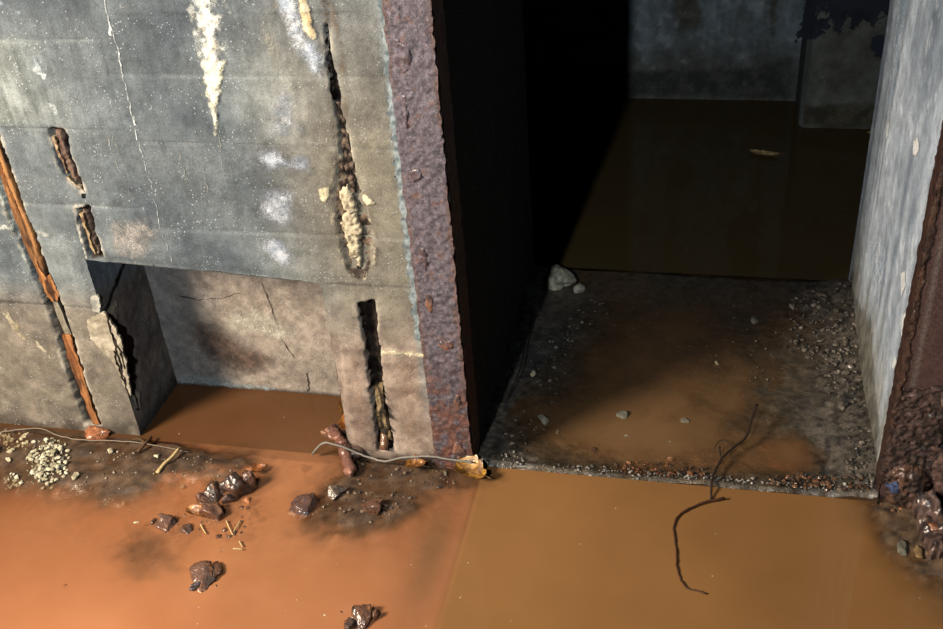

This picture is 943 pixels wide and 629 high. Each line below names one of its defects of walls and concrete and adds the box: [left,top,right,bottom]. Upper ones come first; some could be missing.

crack [104,0,172,261]
efflorescence [188,0,225,135]
crack [319,24,377,280]
rust [392,39,412,73]
peeling [870,35,885,57]